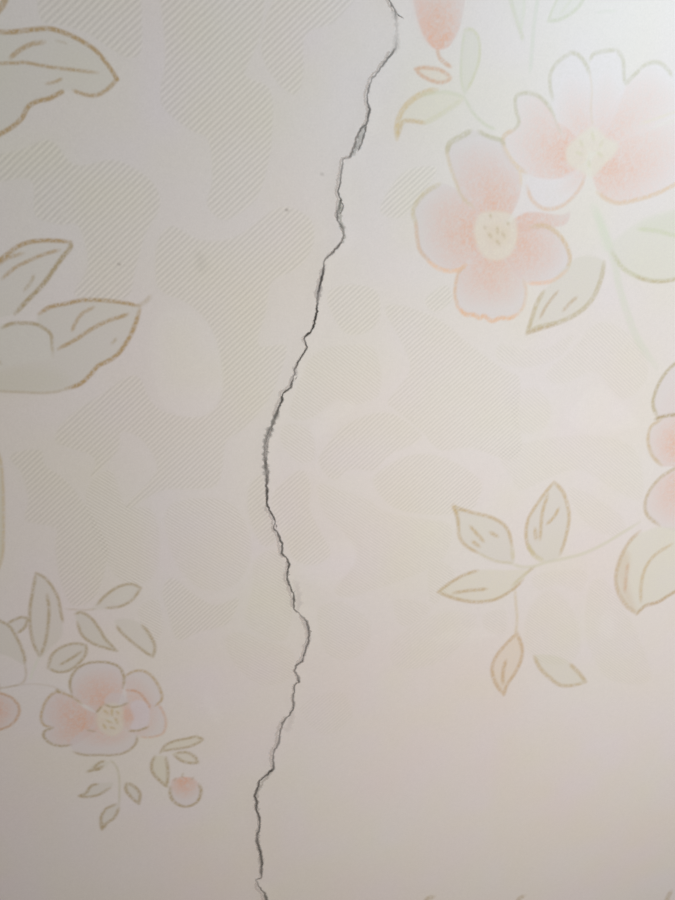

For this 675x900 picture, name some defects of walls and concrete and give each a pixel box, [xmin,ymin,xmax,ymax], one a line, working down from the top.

crack [254,52,390,900]